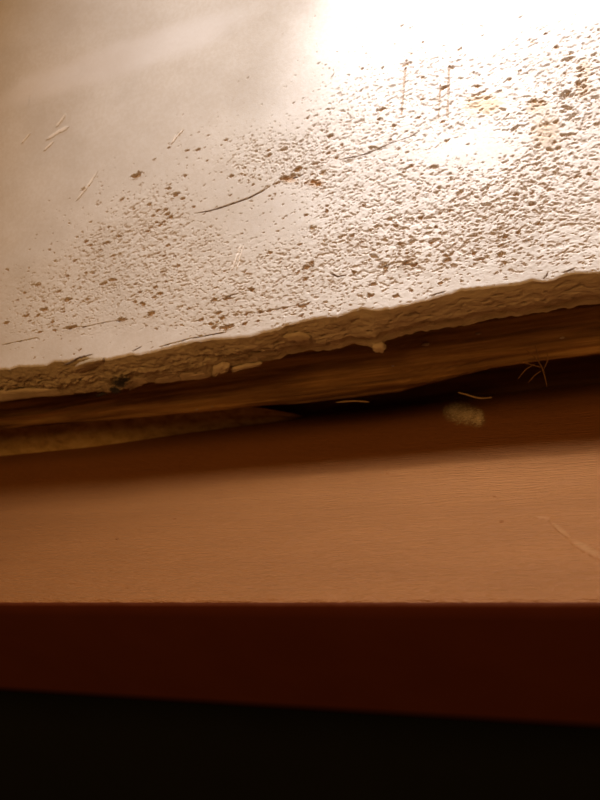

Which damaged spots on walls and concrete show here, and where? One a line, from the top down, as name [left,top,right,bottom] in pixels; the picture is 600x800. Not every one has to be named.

crack [343,131,419,160]
crack [195,190,265,214]